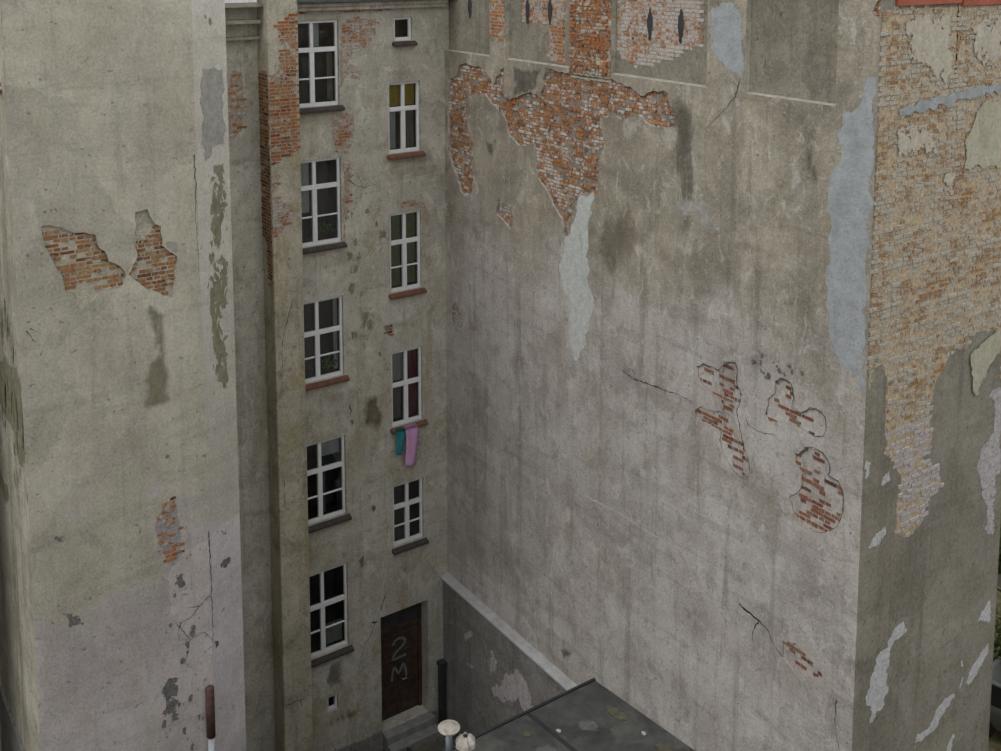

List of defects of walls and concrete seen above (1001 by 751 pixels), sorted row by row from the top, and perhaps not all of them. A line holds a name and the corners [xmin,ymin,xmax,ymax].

spalling [258,8,392,297]
spalling [447,0,675,246]
spalling [617,0,704,68]
spalling [41,209,178,309]
peeling [207,164,228,389]
flaking render [867,0,1001,535]
crack [623,370,693,402]
spalling [695,361,752,481]
spalling [751,352,844,532]
crack [166,531,214,726]
peeling [865,621,907,723]
peeling [910,643,989,751]